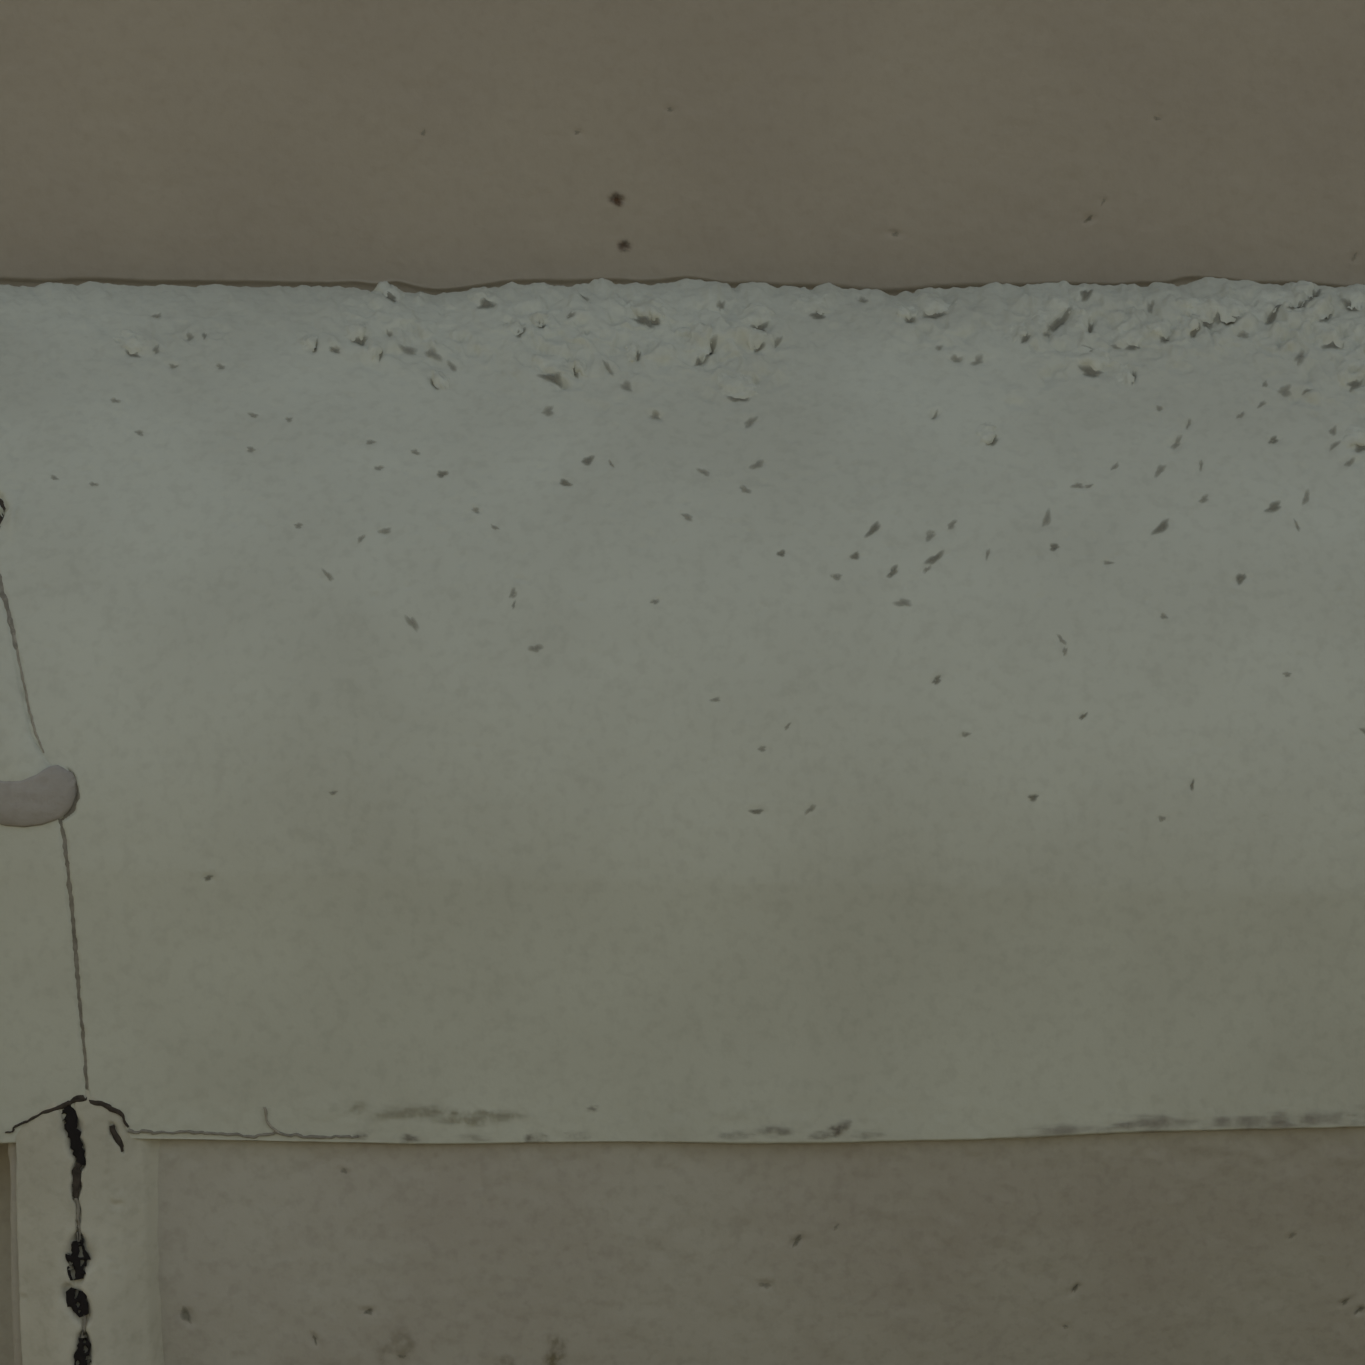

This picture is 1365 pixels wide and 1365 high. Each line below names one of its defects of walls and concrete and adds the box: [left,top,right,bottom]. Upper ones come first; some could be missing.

crack [0,574,44,753]
crack [5,819,359,1365]